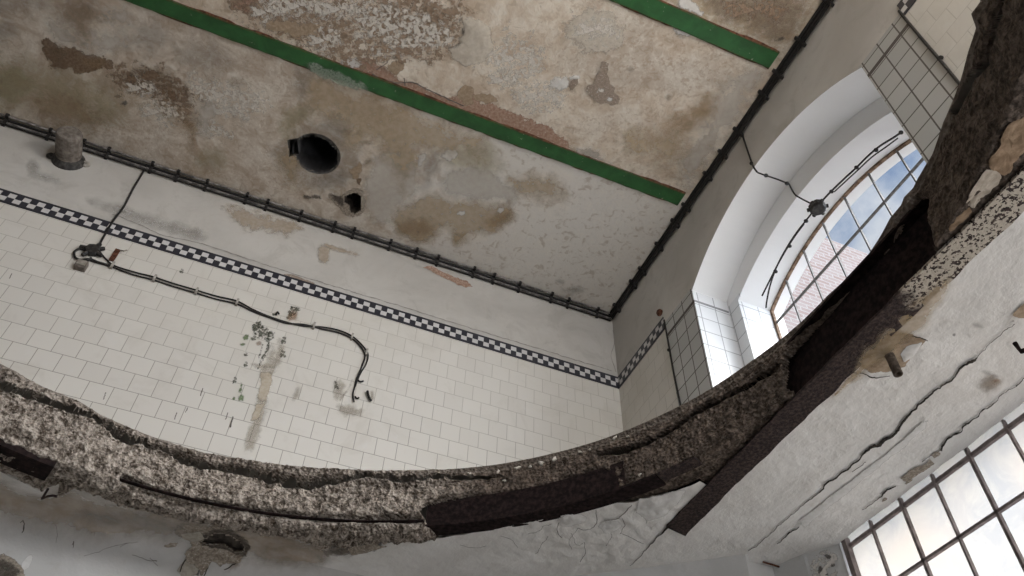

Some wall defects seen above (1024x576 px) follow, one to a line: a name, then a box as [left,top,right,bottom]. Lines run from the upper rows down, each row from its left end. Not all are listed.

peeling [679,0,704,16]
peeling [227,0,570,149]
peeling [549,61,620,105]
spalling [870,0,1024,255]
peeling [319,244,357,263]
leakage [240,321,286,421]
flaking render [860,331,926,373]
spalling [0,288,849,576]
crack [748,324,1024,551]
flaking render [901,452,940,484]